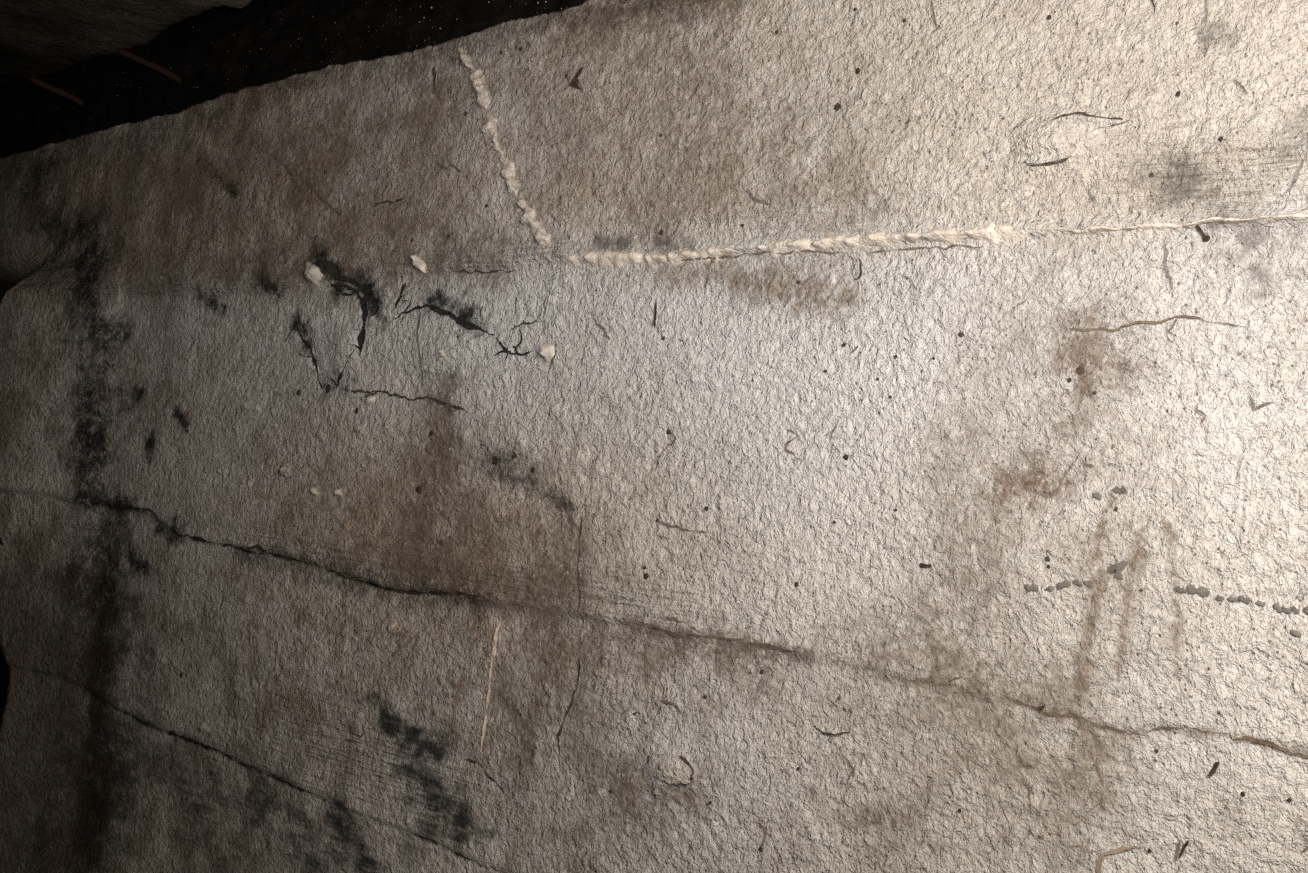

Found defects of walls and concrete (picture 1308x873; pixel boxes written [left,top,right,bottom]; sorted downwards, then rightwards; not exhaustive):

leakage [116,43,552,297]
crack [271,153,557,413]
leakage [560,212,1308,309]
crack [1068,237,1246,343]
crack [116,505,493,672]
leakage [327,798,377,873]
leakage [372,695,471,842]
leakage [480,620,511,764]
crack [556,511,584,751]
crack [649,617,800,652]
leakage [1077,503,1111,691]
crack [1003,696,1308,873]